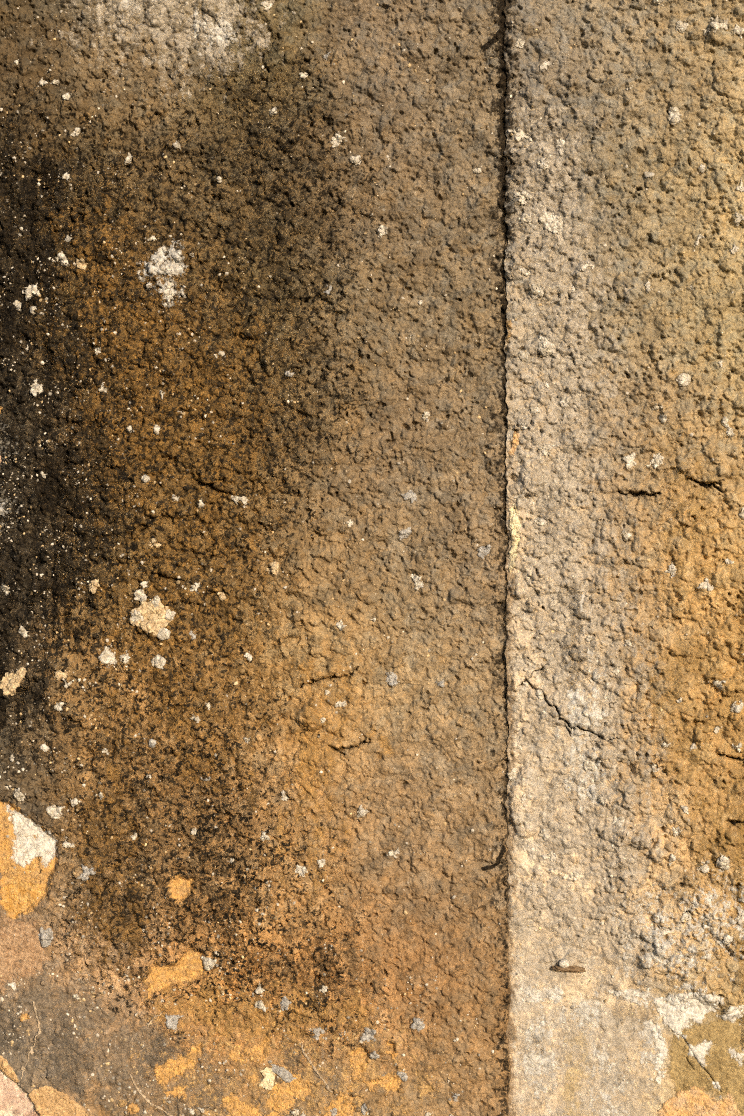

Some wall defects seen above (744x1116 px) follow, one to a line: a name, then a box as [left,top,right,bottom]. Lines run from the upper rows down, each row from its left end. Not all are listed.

damp [0,0,404,1059]
crack [482,0,616,1116]
peeling [0,788,81,993]
peeling [78,864,96,881]
spalling [0,1055,88,1116]
peeling [608,988,744,1116]